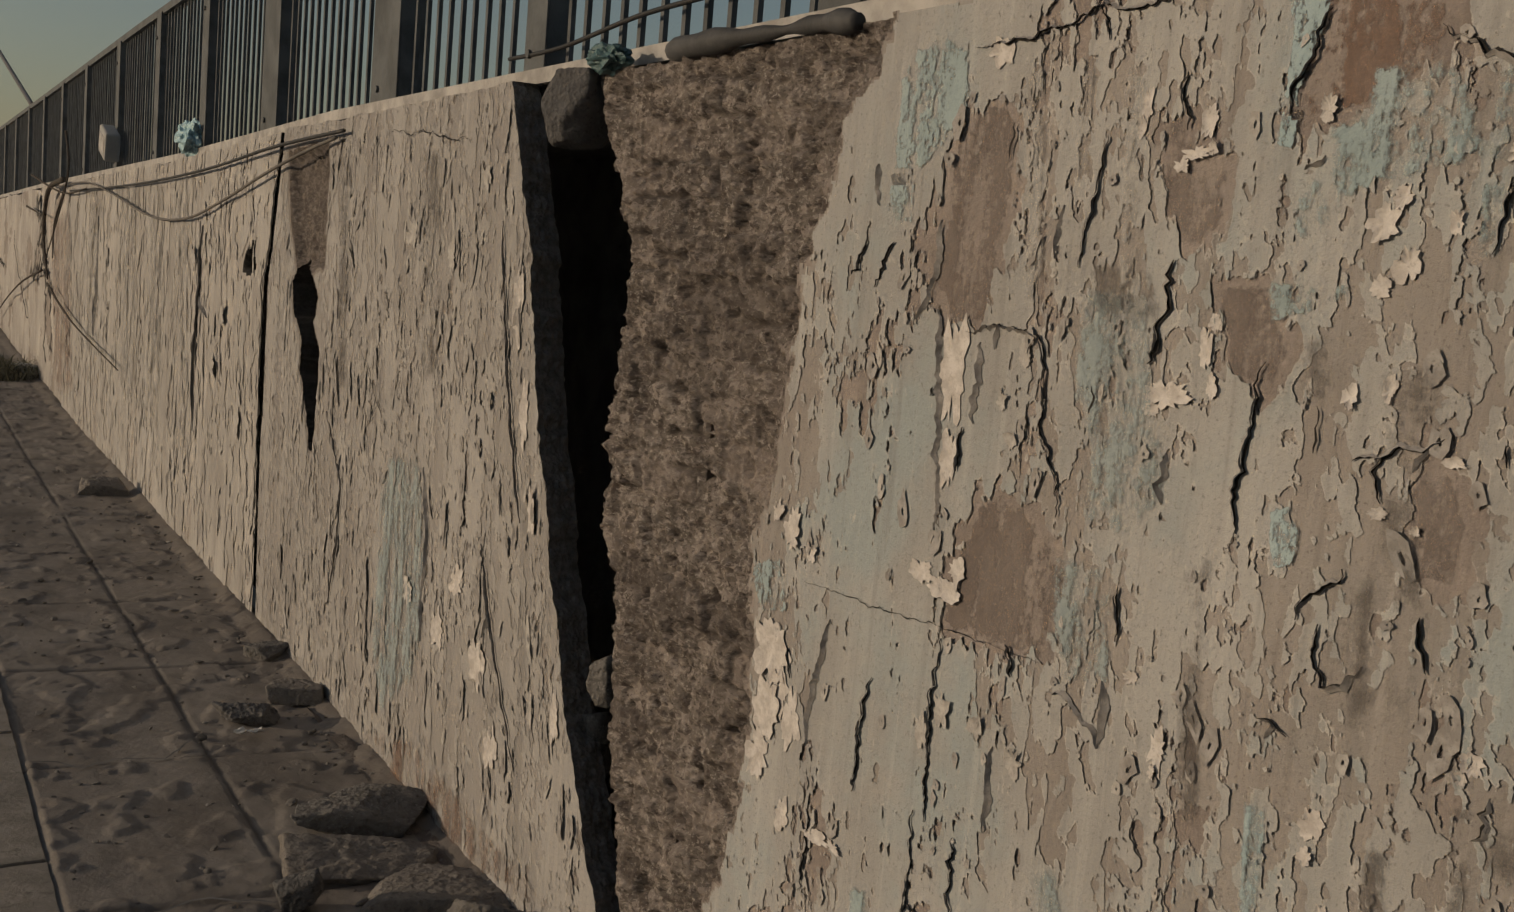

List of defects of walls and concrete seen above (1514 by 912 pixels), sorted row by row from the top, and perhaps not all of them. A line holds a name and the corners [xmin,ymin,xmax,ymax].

crack [979,0,1169,48]
crack [165,199,207,431]
crack [501,221,520,523]
crack [543,116,633,856]
spalling [600,11,910,912]
peeling [897,91,1057,489]
peeling [1142,313,1222,417]
peeling [1151,103,1219,173]
crack [1229,362,1266,542]
peeling [1364,183,1421,299]
crack [480,544,513,765]
peeling [1404,694,1487,787]